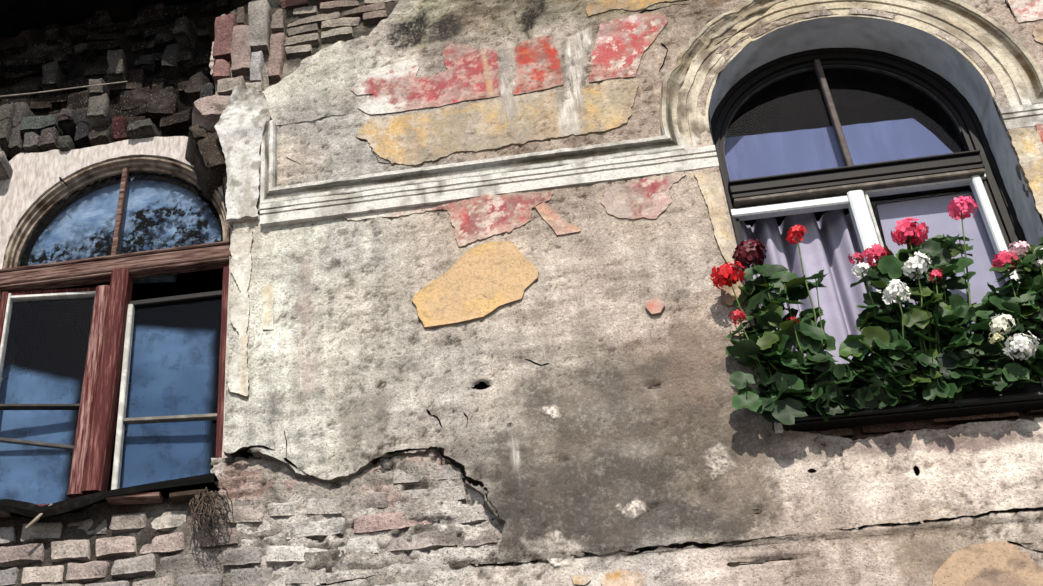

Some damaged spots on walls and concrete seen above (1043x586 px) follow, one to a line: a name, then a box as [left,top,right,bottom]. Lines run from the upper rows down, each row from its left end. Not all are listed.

flaking render [213,0,399,96]
peeling [1007,0,1043,45]
flaking render [0,148,13,180]
peeling [1007,124,1043,223]
peeling [343,191,581,329]
peeling [228,231,274,399]
crack [235,430,323,482]
crack [372,409,499,517]
water stain [493,326,781,561]
flaking render [801,409,1043,441]
flaking render [0,450,505,586]
crack [467,534,799,567]